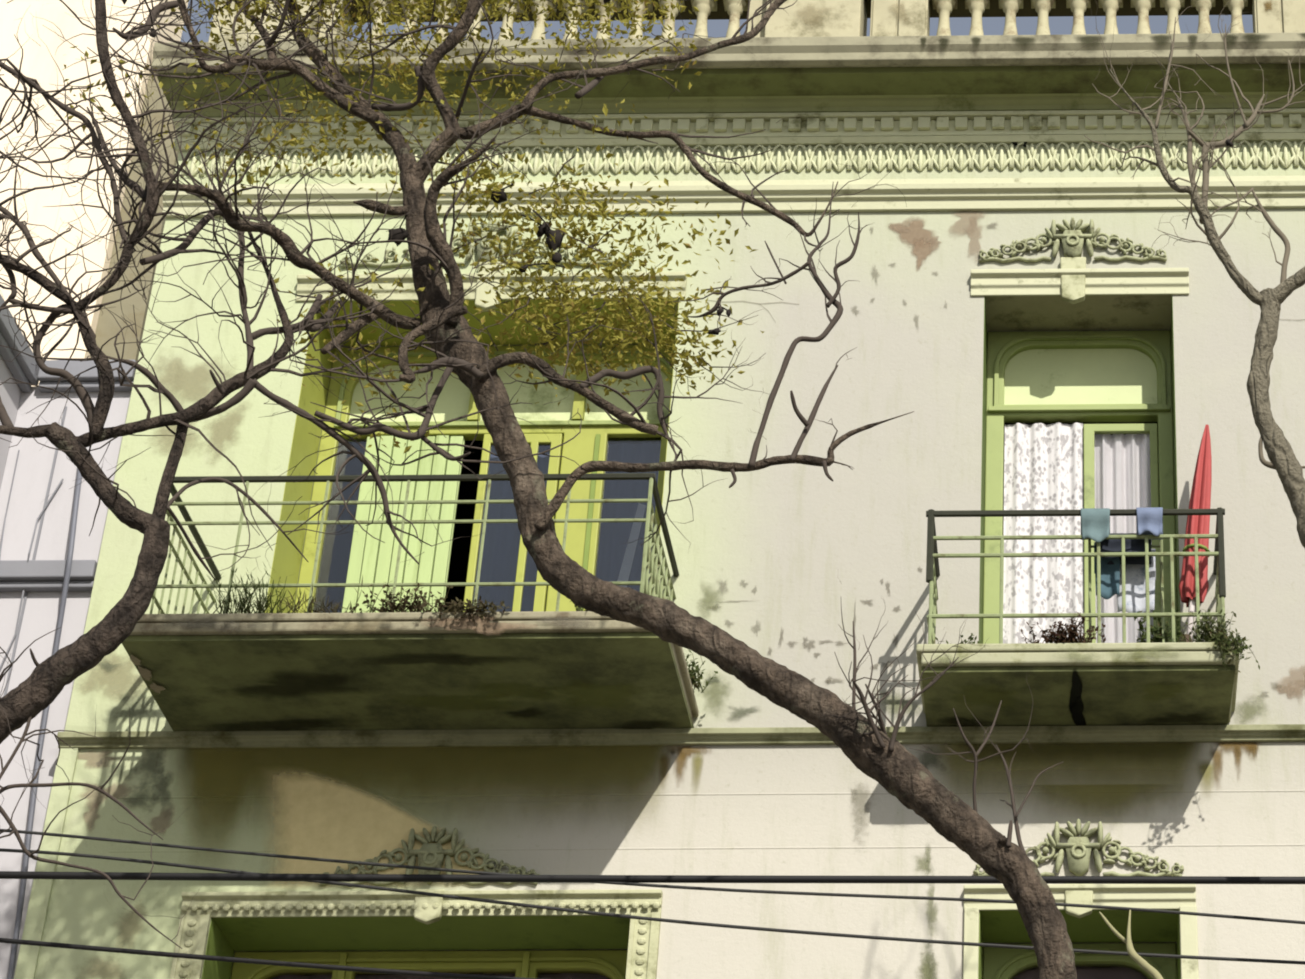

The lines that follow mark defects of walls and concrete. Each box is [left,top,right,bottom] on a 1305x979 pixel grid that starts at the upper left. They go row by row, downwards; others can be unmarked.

peeling [891,220,940,269]
peeling [953,211,995,251]
damp [378,655,500,664]
damp [120,700,148,717]
damp [216,720,333,730]
damp [239,674,352,695]
damp [944,718,986,727]
crack [1069,669,1086,726]
damp [1148,715,1208,723]
peeling [1277,667,1305,697]
rust [660,746,703,777]
rust [1200,742,1257,782]